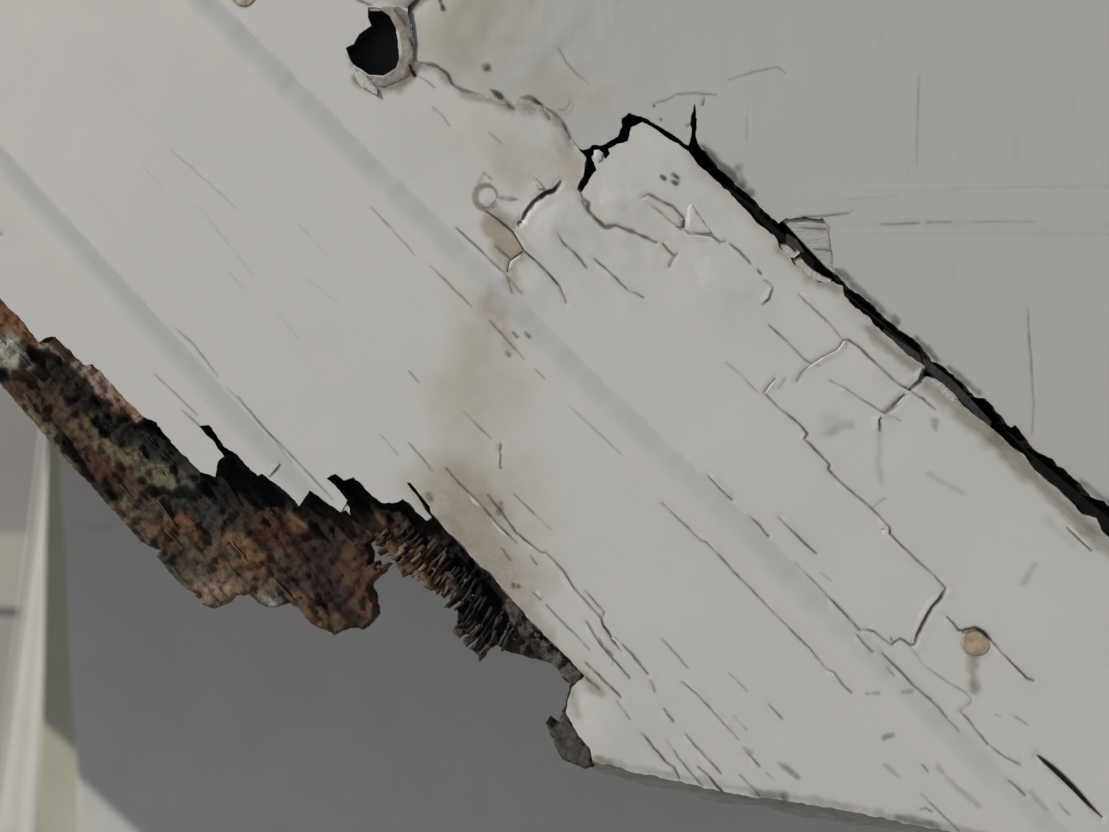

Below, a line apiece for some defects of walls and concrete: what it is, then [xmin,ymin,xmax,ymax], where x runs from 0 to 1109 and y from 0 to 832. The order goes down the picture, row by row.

crack [409,43,452,84]
crack [490,89,542,105]
peeling [779,244,832,282]
crack [486,110,959,720]
crack [1067,524,1094,551]
crack [445,468,648,696]
crack [989,638,1034,684]
spalling [546,685,594,769]
crack [645,708,723,793]